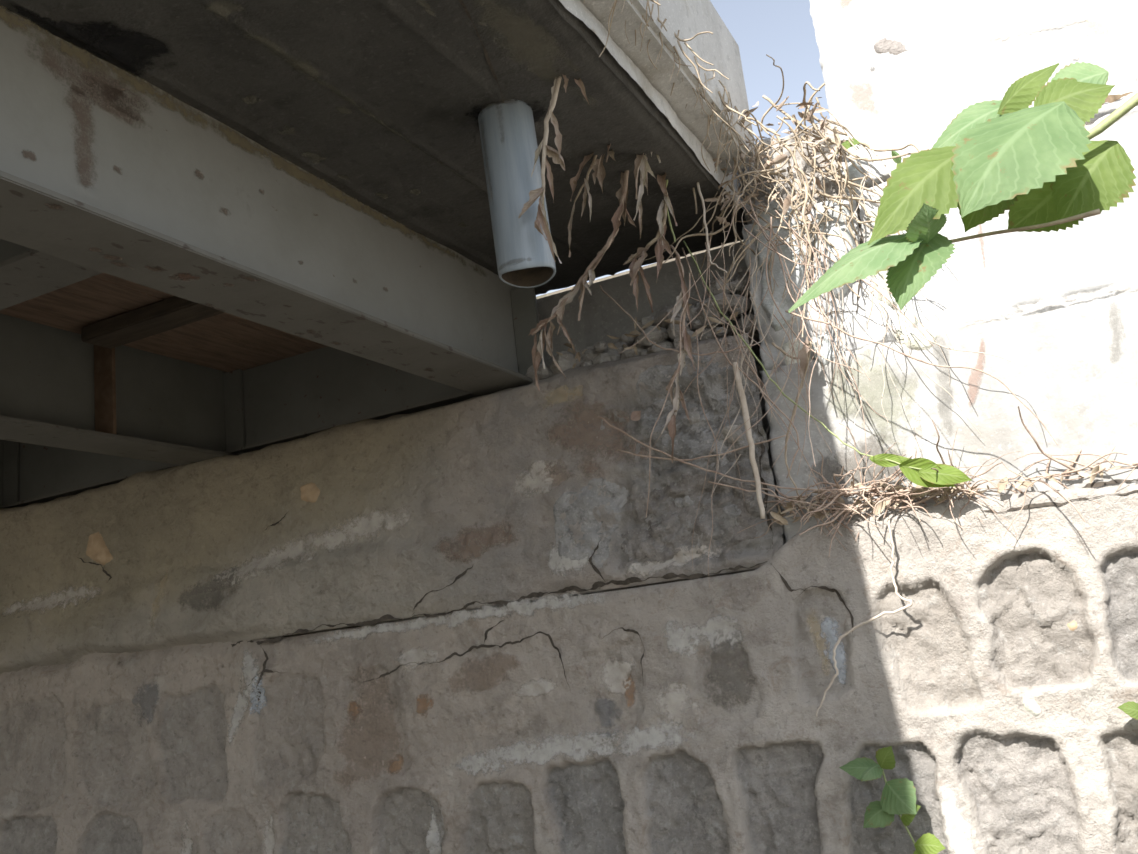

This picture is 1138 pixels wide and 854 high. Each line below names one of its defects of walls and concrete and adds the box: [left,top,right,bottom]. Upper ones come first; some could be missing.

damp [7,5,174,76]
corrosion [42,46,141,185]
crack [973,479,1138,513]
spalling [86,532,113,566]
crack [231,410,854,708]